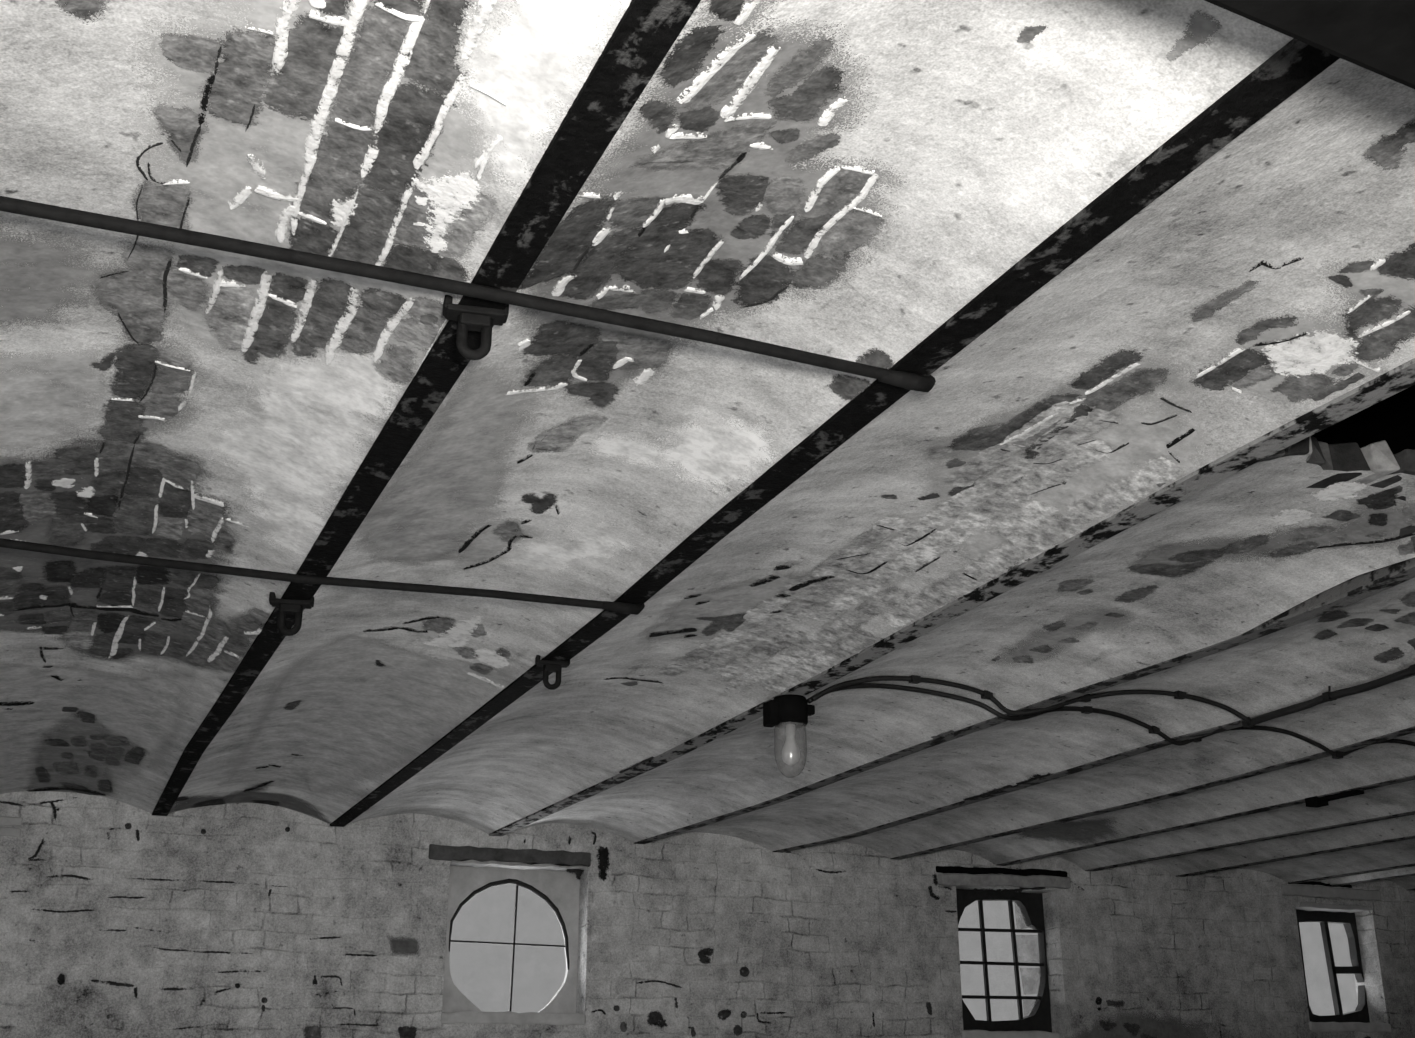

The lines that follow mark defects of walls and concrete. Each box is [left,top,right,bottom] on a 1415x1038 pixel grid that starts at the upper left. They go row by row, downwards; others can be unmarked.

crack [246,105,255,130]
crack [101,46,222,313]
flaking render [506,0,919,464]
crack [118,313,157,401]
flaking render [0,0,507,674]
crack [100,436,139,509]
flaking render [637,236,1415,694]
flaking render [450,493,560,572]
flaking render [25,707,156,797]